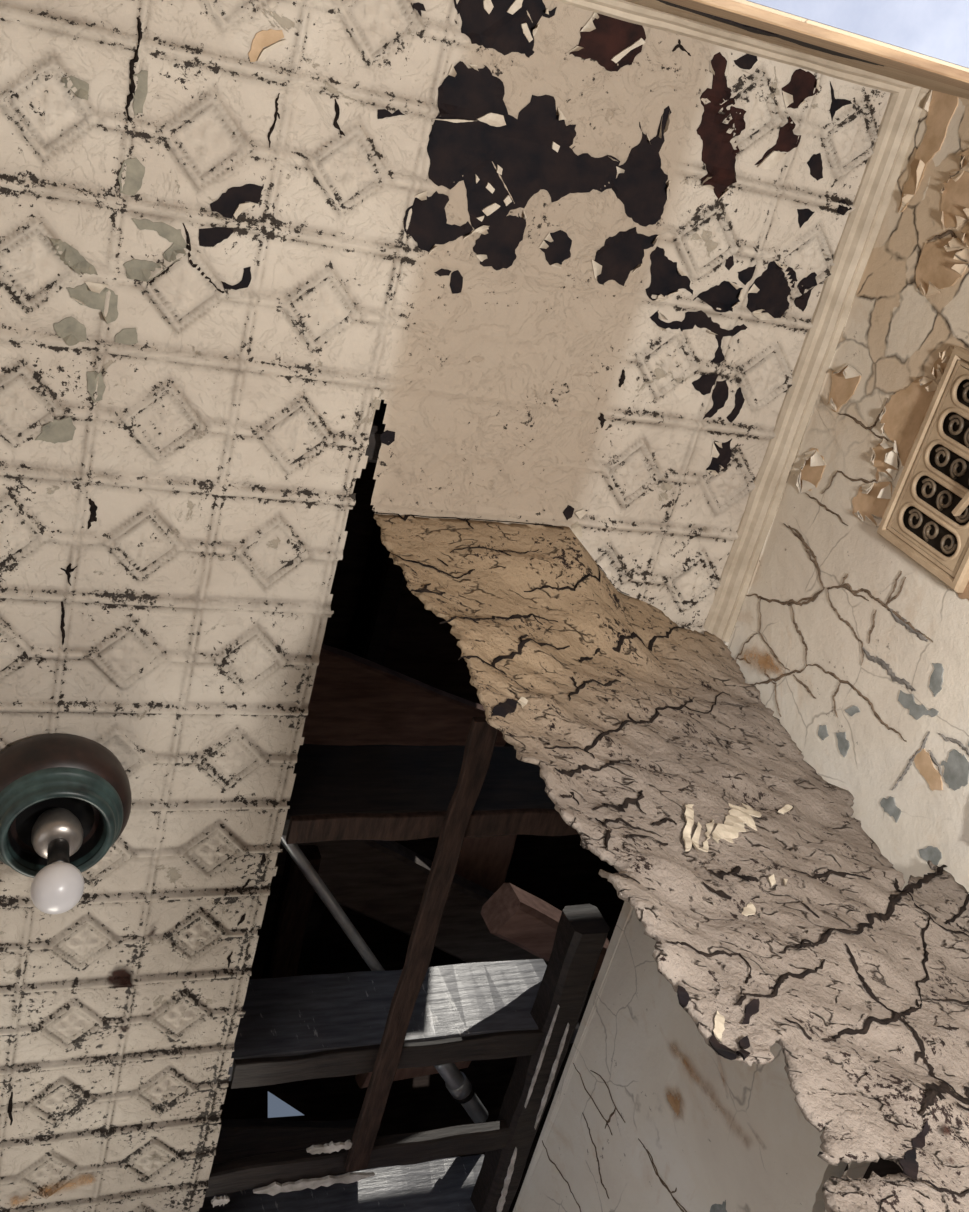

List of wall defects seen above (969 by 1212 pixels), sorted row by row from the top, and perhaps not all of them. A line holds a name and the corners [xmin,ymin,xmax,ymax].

crack [125,17,142,123]
peeling [454,0,557,58]
peeling [567,12,646,72]
peeling [755,69,852,169]
peeling [807,153,823,181]
peeling [48,237,138,346]
peeling [123,184,264,282]
peeling [221,267,251,290]
peeling [403,52,817,422]
crack [805,398,899,526]
crack [374,512,685,700]
crack [544,523,969,884]